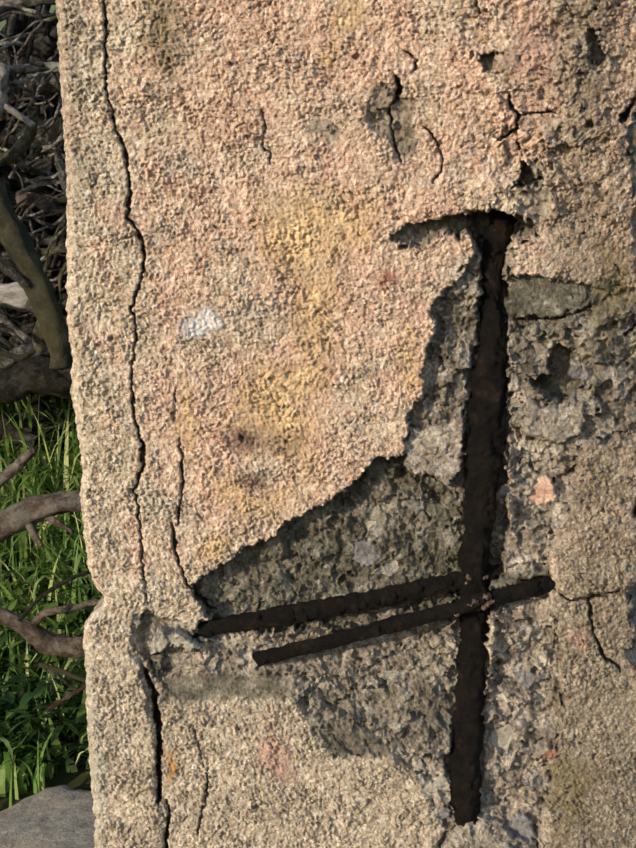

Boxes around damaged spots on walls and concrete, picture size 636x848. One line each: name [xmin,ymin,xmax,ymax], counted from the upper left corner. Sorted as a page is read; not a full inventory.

peeling [361,82,418,161]
crack [388,51,418,164]
crack [497,94,557,156]
spalling [584,28,608,69]
crack [103,0,149,605]
crack [172,390,217,610]
spalling [188,209,491,620]
spalling [486,161,636,592]
crack [144,667,172,848]
spalling [131,589,461,848]
spalling [477,592,567,848]
crack [560,589,622,673]